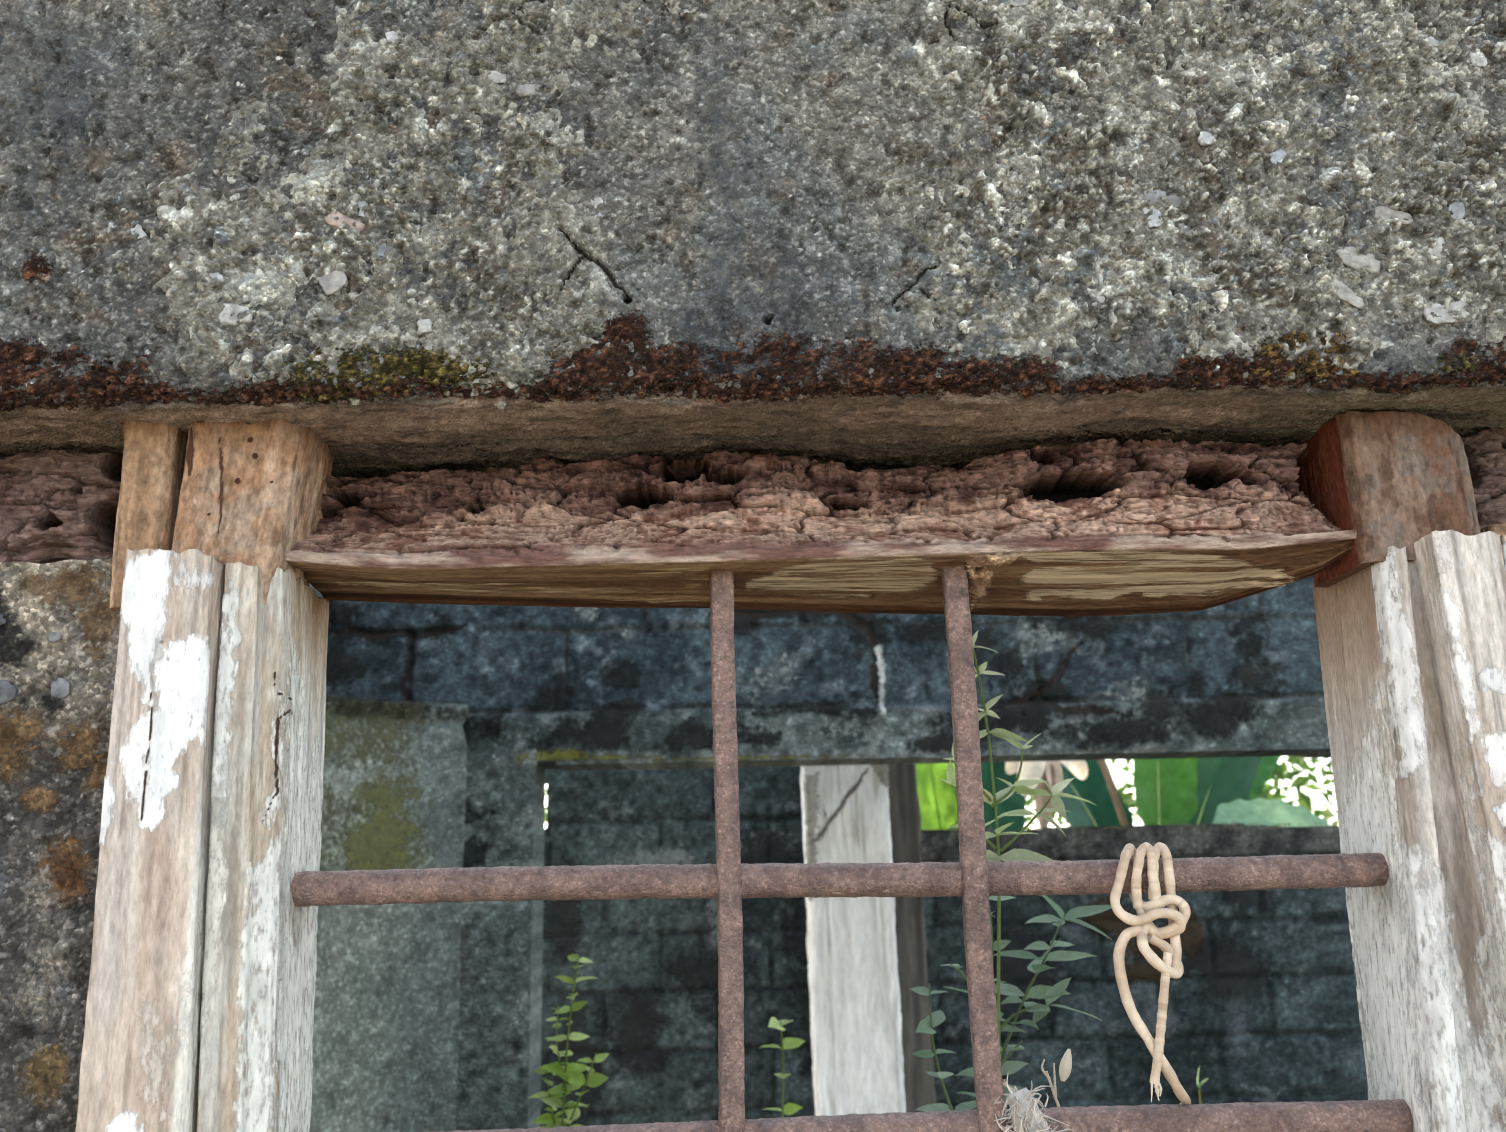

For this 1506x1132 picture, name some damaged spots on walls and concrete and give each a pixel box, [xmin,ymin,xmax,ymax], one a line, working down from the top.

corrosion [20,252,56,283]
crack [561,231,628,301]
crack [892,266,937,306]
corrosion [0,309,1506,412]
crack [262,672,293,822]
peeling [99,549,323,1132]
peeling [1337,536,1506,1132]